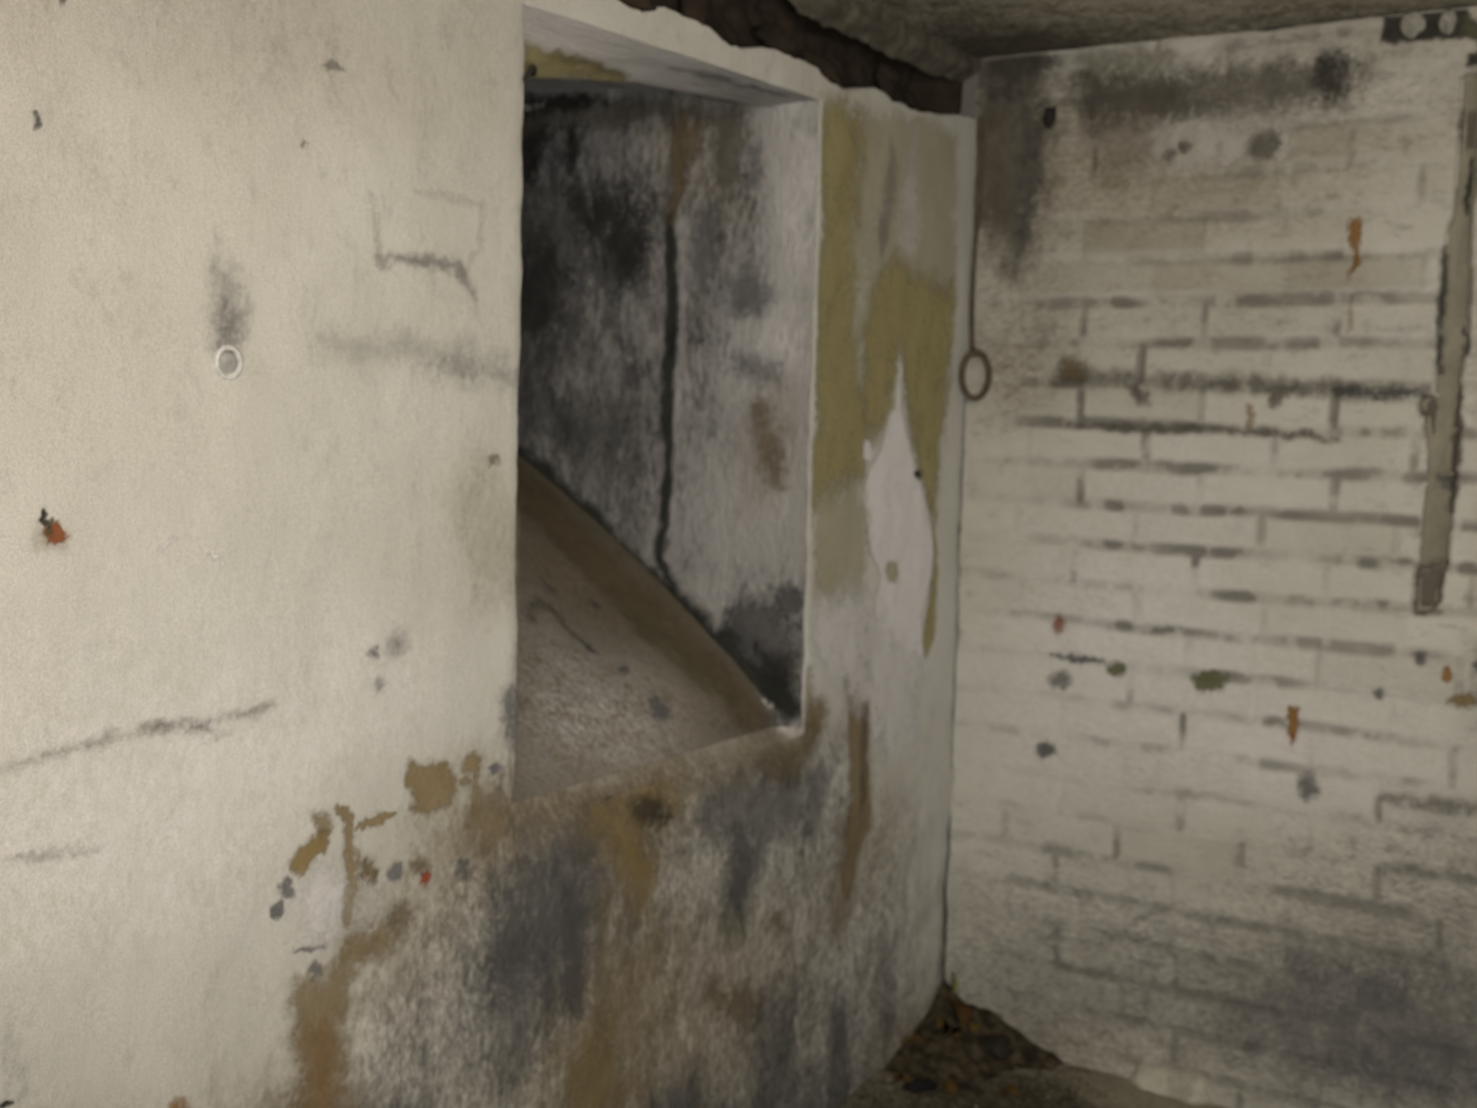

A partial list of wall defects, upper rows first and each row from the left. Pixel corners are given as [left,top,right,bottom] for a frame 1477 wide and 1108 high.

damp [524,45,625,82]
damp [517,97,744,433]
crack [655,112,686,585]
crack [698,72,781,95]
peeling [619,0,982,758]
damp [956,34,1091,276]
rust [1348,217,1362,273]
rust [39,509,67,544]
flaking render [270,751,510,980]
damp [516,467,826,786]
damp [842,657,871,896]
rust [1287,706,1300,744]